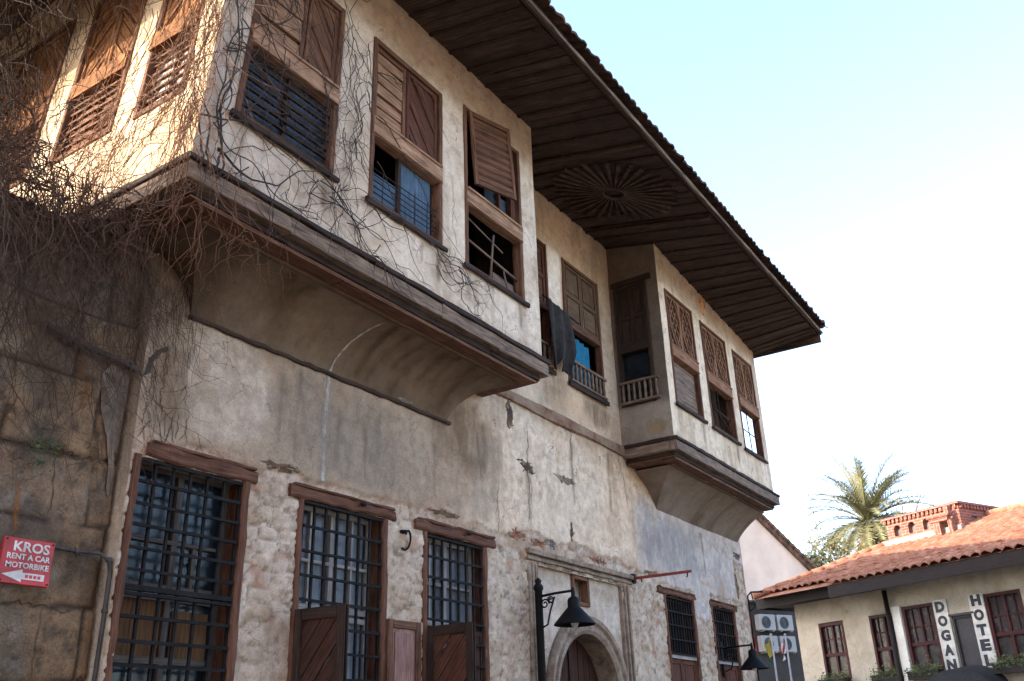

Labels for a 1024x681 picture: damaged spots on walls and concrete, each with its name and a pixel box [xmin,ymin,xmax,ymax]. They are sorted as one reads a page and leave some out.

flaking render [260,460,302,474]
flaking render [553,473,576,486]
flaking render [428,507,460,519]
spalling [508,527,557,550]